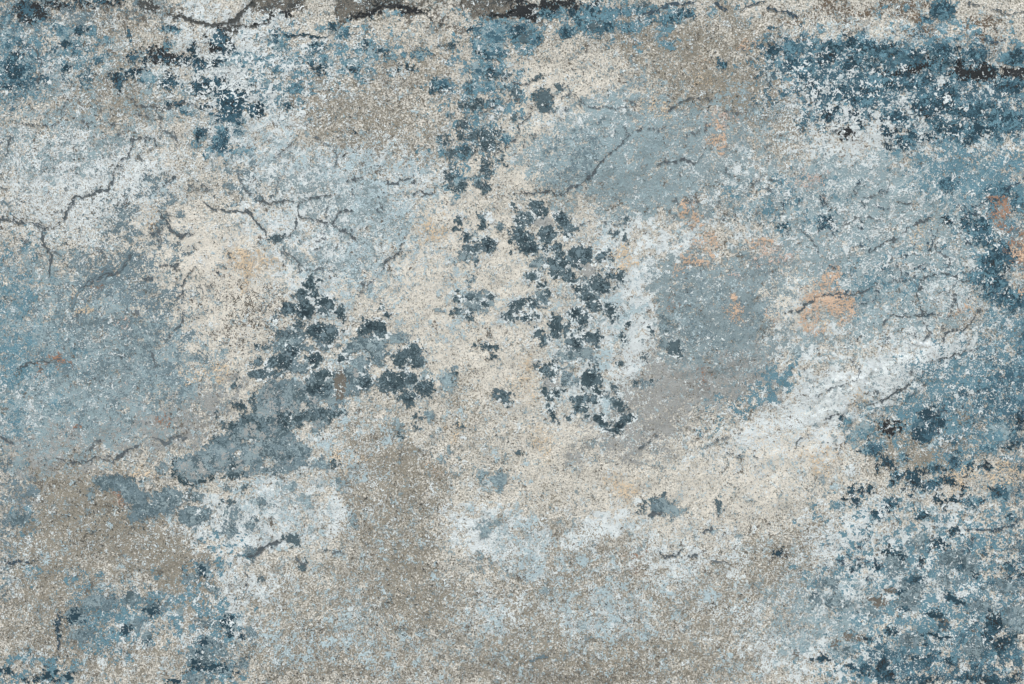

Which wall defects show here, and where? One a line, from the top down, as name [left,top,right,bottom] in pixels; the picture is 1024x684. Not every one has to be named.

crack [0,96,206,278]
crack [16,135,435,370]
crack [479,58,1024,452]
corrosion [764,264,862,340]